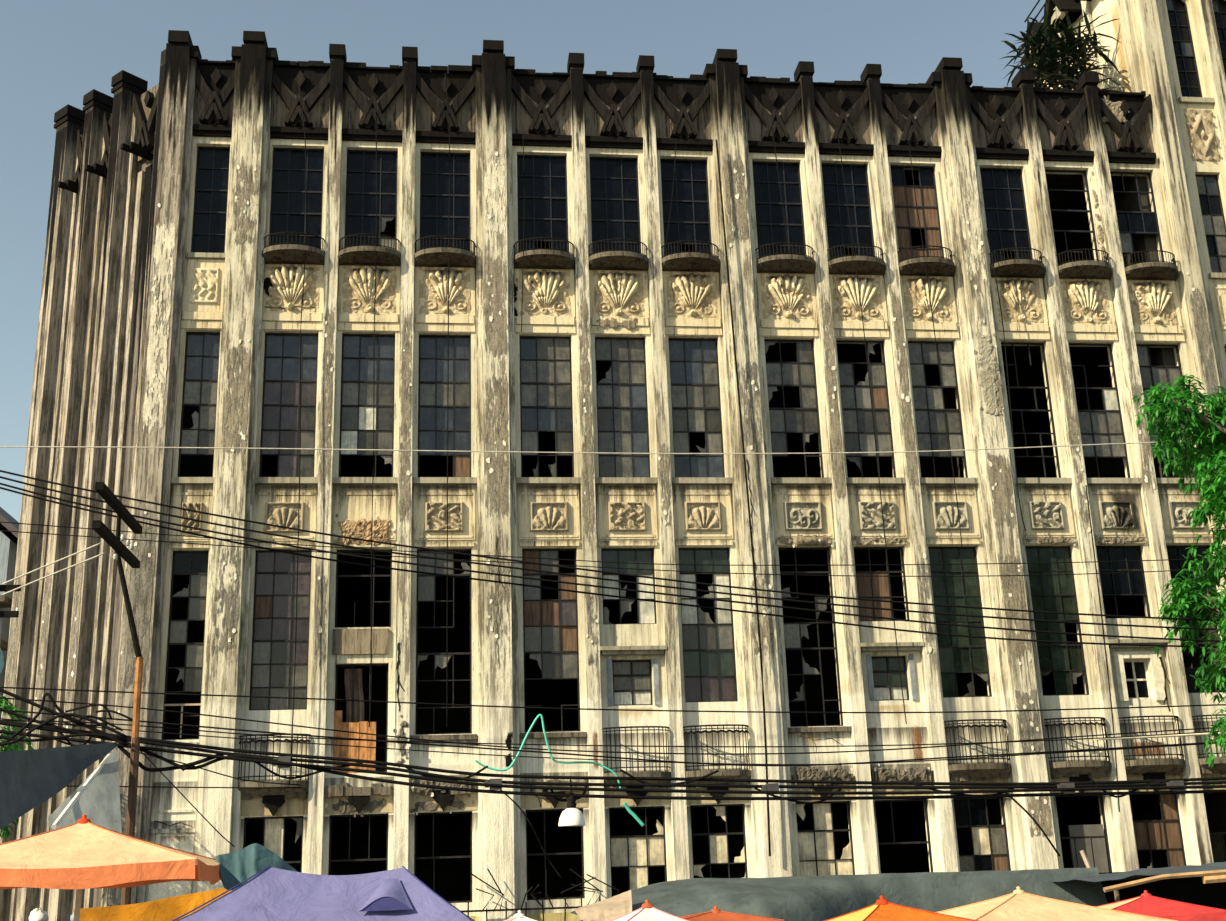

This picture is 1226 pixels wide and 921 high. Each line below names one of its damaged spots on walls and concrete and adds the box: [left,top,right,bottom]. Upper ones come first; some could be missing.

damp [29,126,67,462]
damp [53,109,93,518]
damp [96,91,122,365]
peeling [143,203,176,438]
damp [716,62,740,124]